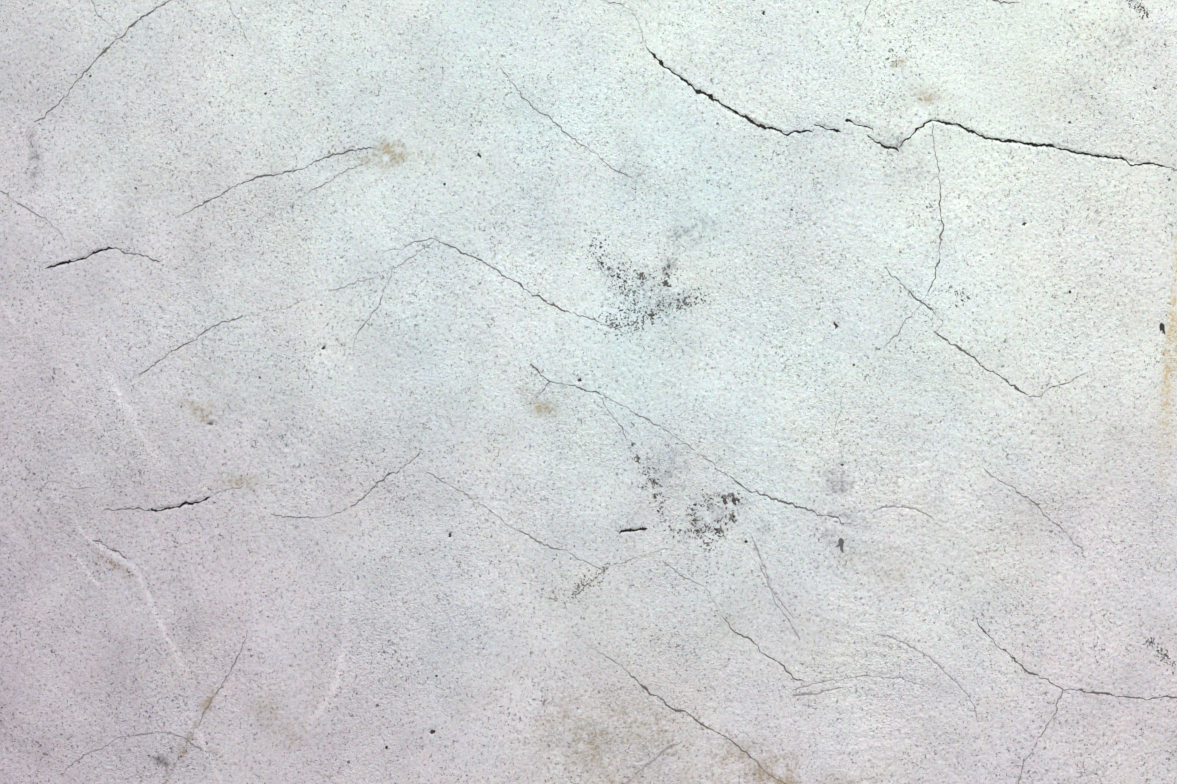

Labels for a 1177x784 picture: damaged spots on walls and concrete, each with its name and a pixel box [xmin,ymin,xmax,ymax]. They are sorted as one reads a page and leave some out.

crack [28,0,170,159]
crack [501,68,632,178]
crack [1,191,161,269]
crack [182,147,372,217]
crack [606,0,1177,397]
crack [138,300,301,376]
crack [328,238,627,347]
crack [37,481,241,512]
crack [977,619,1177,784]